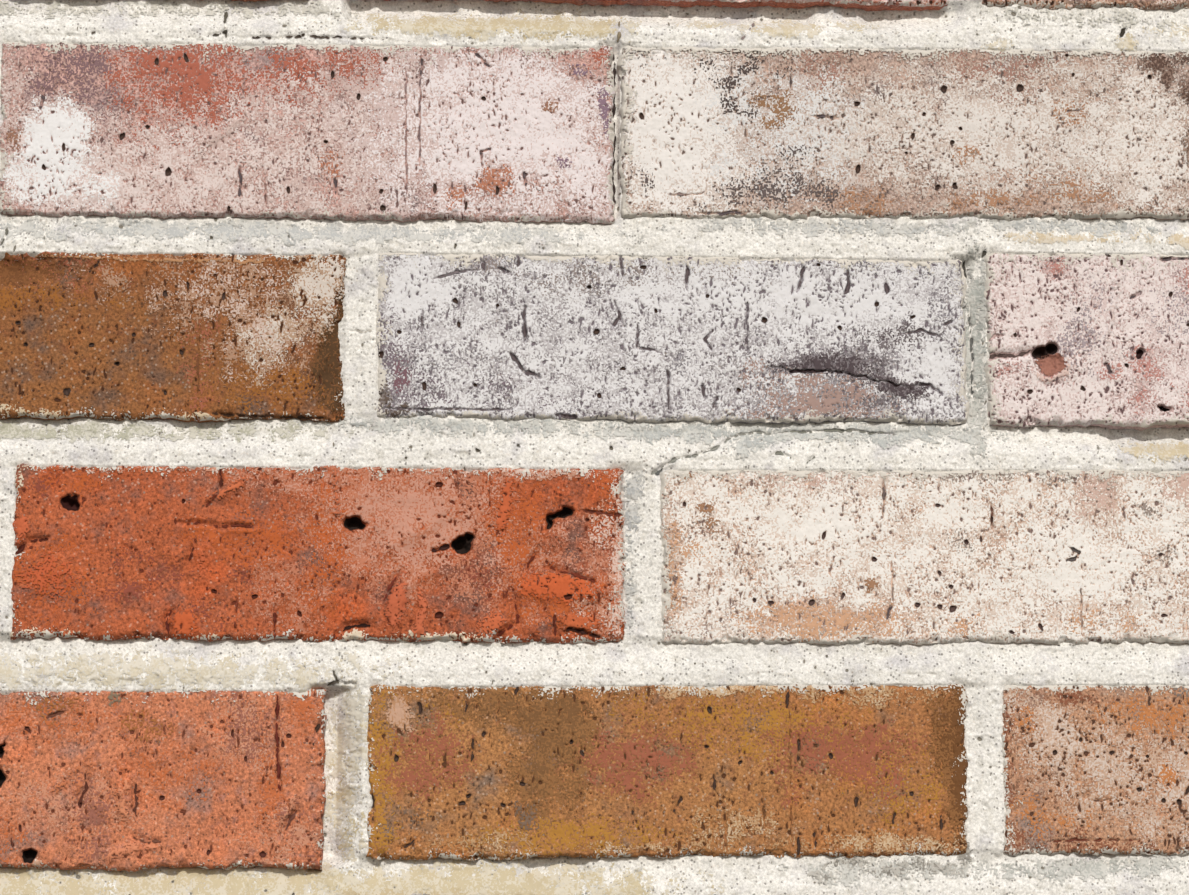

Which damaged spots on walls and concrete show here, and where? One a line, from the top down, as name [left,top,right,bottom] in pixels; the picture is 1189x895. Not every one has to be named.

crack [843,271,851,294]
crack [903,251,1031,394]
crack [613,303,670,408]
crack [772,367,941,393]
crack [651,428,896,475]